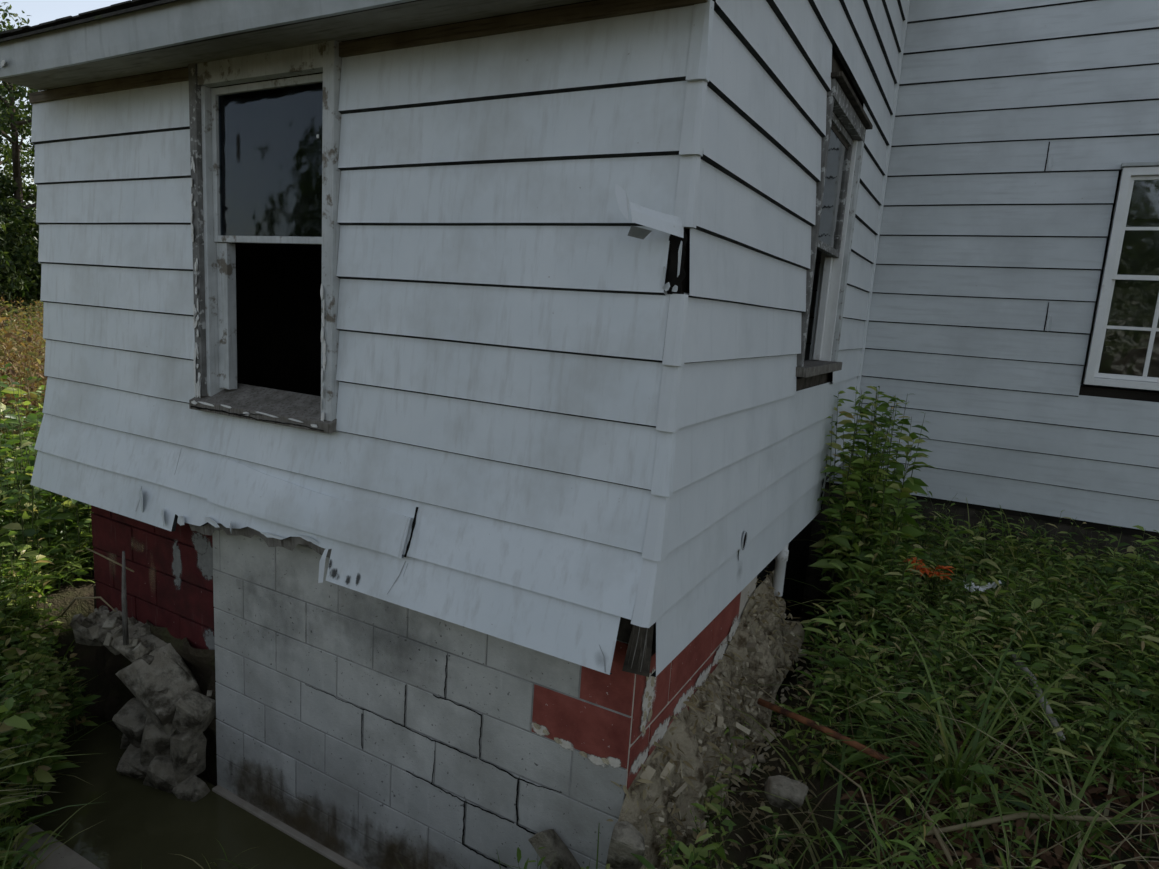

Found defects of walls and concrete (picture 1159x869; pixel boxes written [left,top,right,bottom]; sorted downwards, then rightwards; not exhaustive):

peeling [191,258,326,428]
peeling [172,541,182,589]
peeling [192,532,214,580]
spalling [532,616,740,773]
water stain [239,764,344,850]